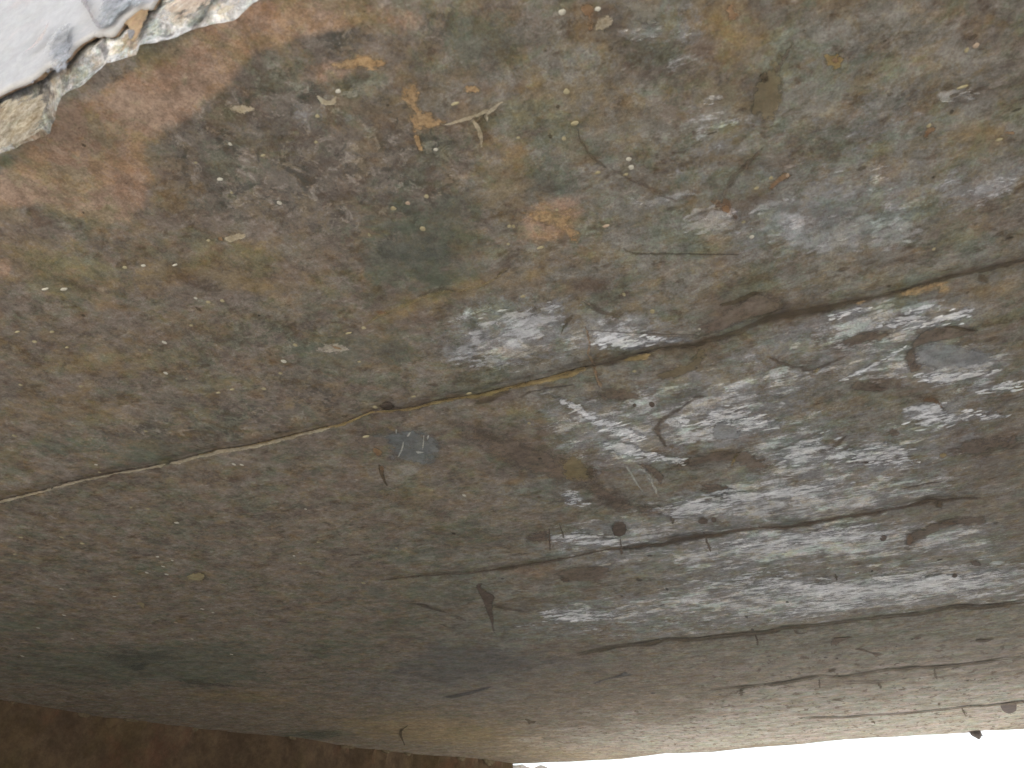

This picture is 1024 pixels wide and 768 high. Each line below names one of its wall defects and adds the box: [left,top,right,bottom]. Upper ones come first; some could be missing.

rust [402,84,445,151]
crack [561,315,612,387]
damp [590,329,689,350]
crack [770,355,847,373]
damp [875,302,974,330]
damp [839,344,1024,394]
damp [559,399,688,466]
crack [654,396,705,446]
crack [809,435,911,465]
damp [772,402,1012,469]
damp [652,478,856,522]
damp [688,523,1024,619]